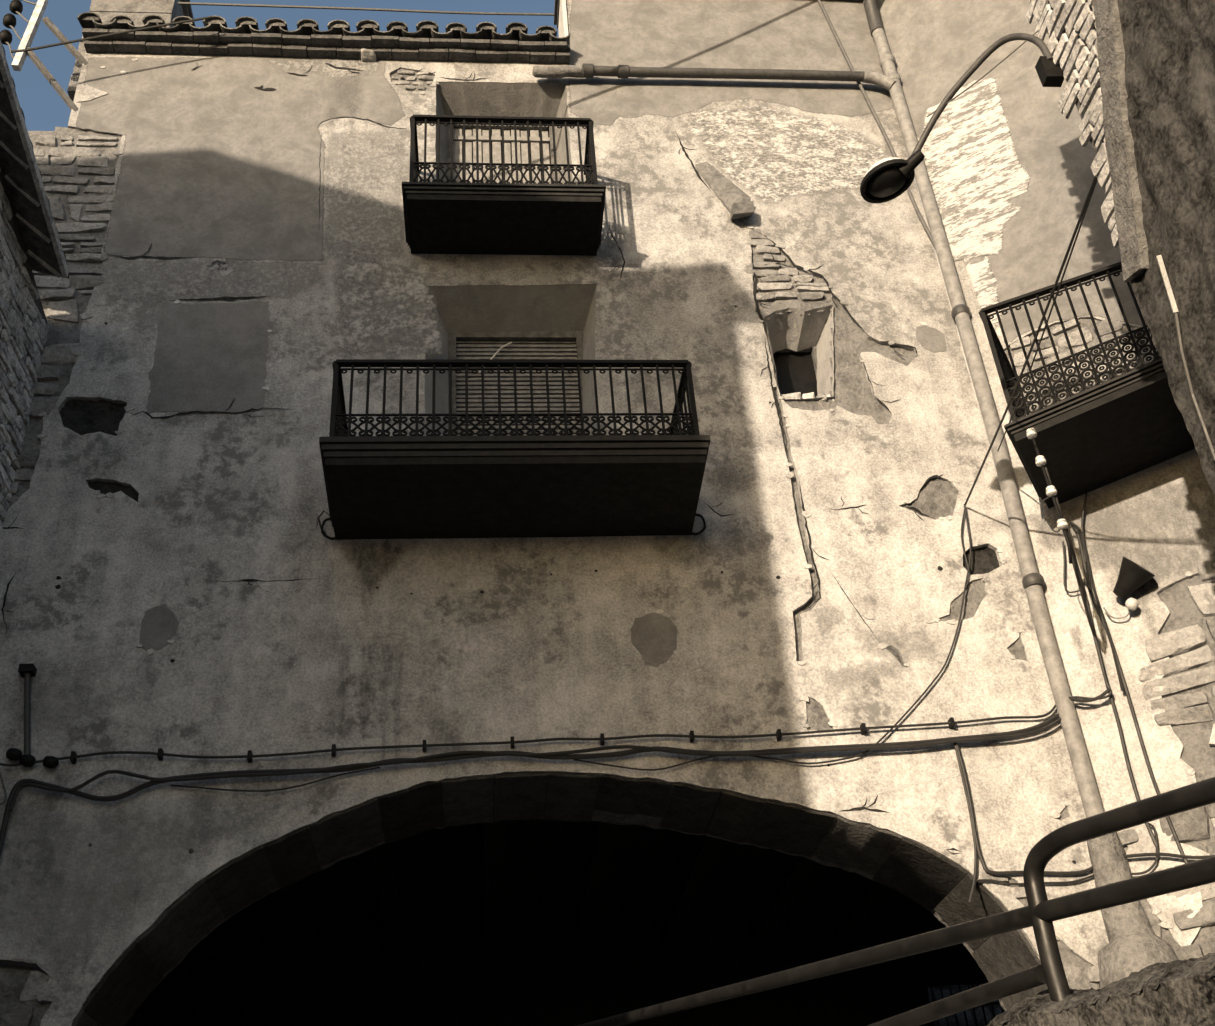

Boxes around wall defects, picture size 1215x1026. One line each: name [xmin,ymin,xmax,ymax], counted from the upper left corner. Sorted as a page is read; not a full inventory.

peeling [923,78,1030,329]
flaking render [8,127,441,507]
spalling [744,225,917,428]
spalling [901,478,959,521]
spalling [926,540,1007,624]
flaking render [1139,560,1215,782]
flaking render [1117,829,1139,853]
flaking render [1159,803,1215,855]
flaking render [1140,883,1215,960]
spalling [0,964,57,1026]